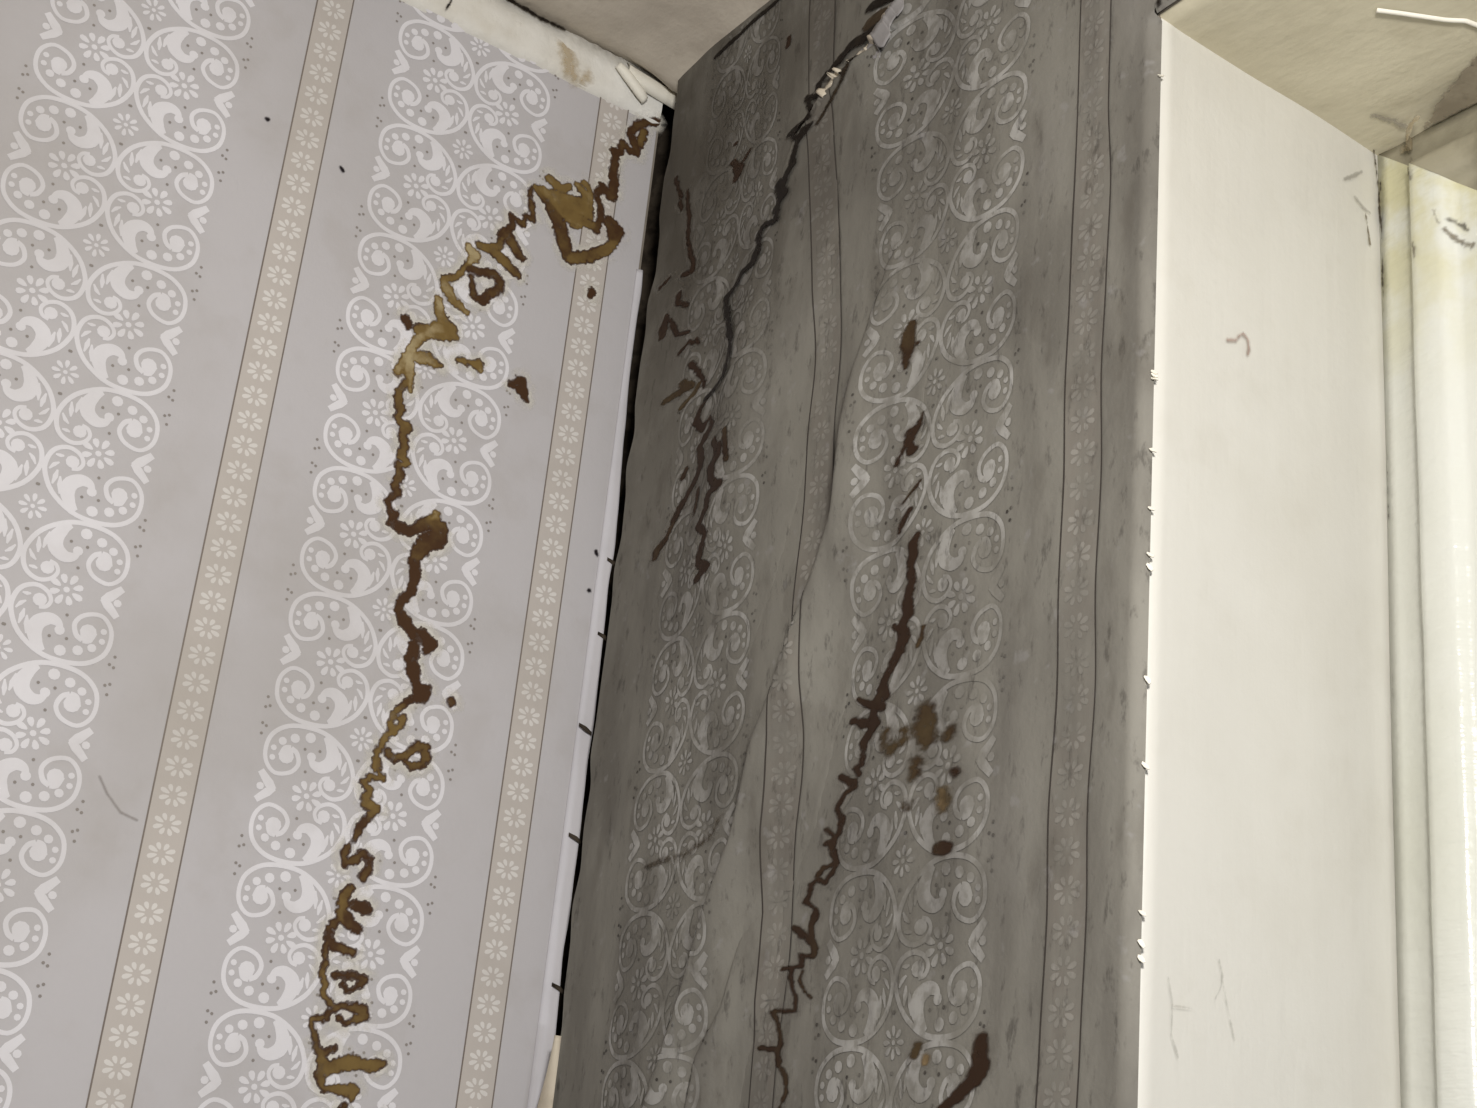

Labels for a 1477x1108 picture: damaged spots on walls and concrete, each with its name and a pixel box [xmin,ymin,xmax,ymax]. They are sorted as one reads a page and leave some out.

crack [703,0,894,401]
spalling [1374,57,1477,179]
peeling [1376,8,1477,28]
crack [556,103,675,1036]